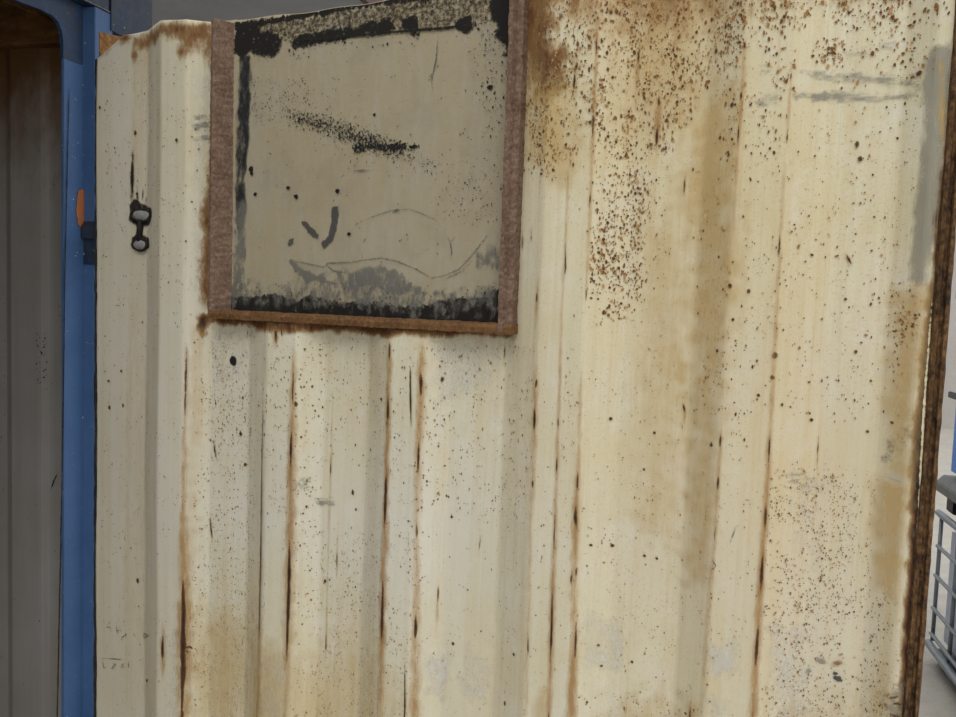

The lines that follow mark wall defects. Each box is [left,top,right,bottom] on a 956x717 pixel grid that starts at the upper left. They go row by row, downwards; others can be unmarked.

corrosion [103,20,212,115]
leakage [231,15,500,323]
leakage [488,0,510,56]
corrosion [99,100,553,717]
corrosion [533,475,713,717]
corrosion [671,169,943,717]